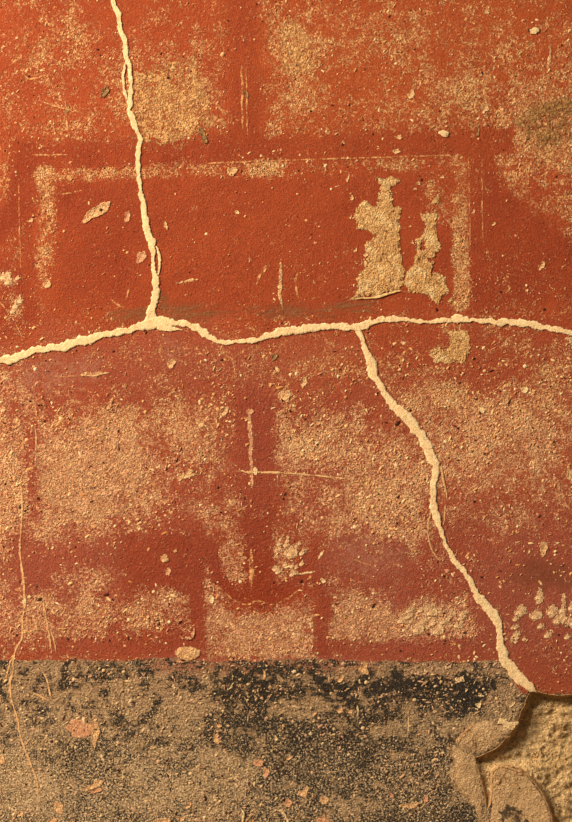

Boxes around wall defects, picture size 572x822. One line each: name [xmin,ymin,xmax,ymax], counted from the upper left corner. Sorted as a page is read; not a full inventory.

crack [0,0,572,365]
peeling [349,176,455,305]
crack [5,483,56,796]
crack [240,470,350,480]
crack [355,325,536,692]
flaking render [473,690,572,822]